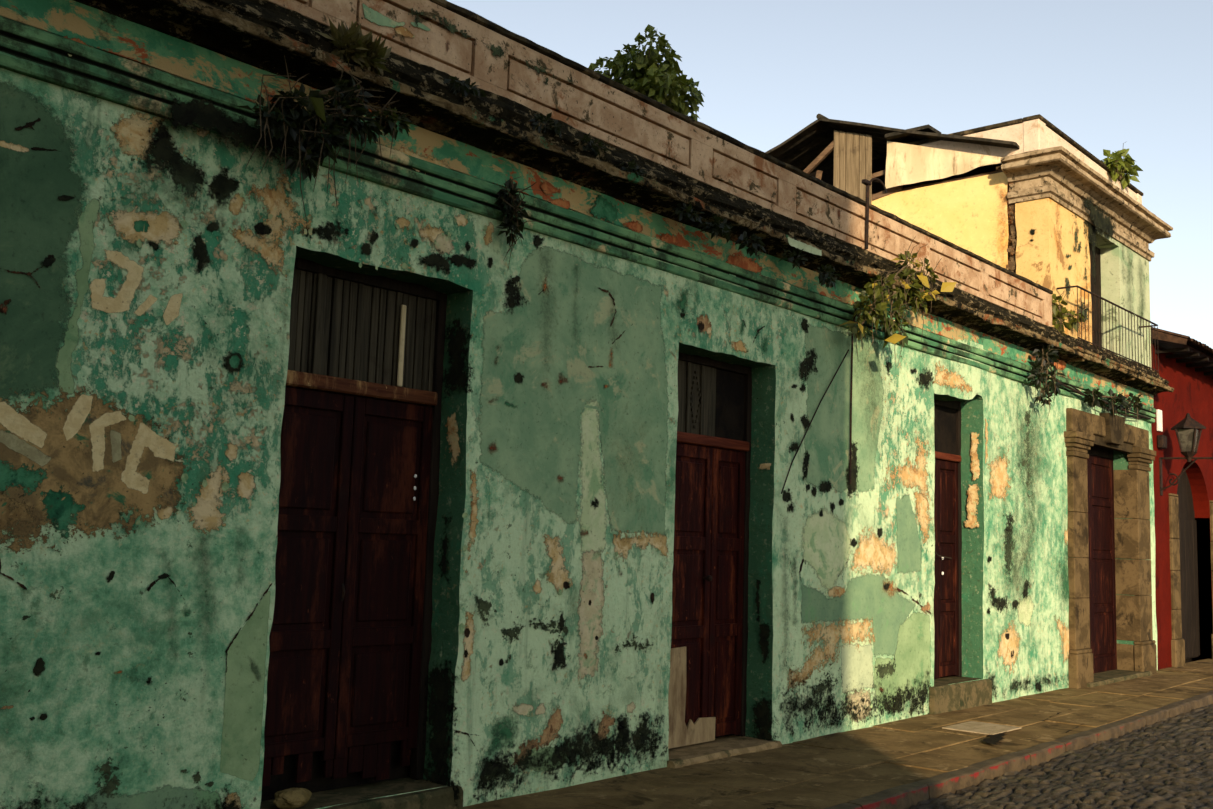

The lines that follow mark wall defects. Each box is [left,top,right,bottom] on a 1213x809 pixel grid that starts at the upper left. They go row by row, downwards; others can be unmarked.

peeling [103,202,188,250]
peeling [222,172,313,278]
damp [442,313,475,398]
peeling [0,383,257,565]
peeling [880,436,934,544]
peeling [963,419,1011,529]
peeling [850,527,897,580]
damp [33,658,45,676]
damp [421,660,668,807]
damp [746,657,931,742]
damp [0,757,122,809]
damp [180,769,240,809]